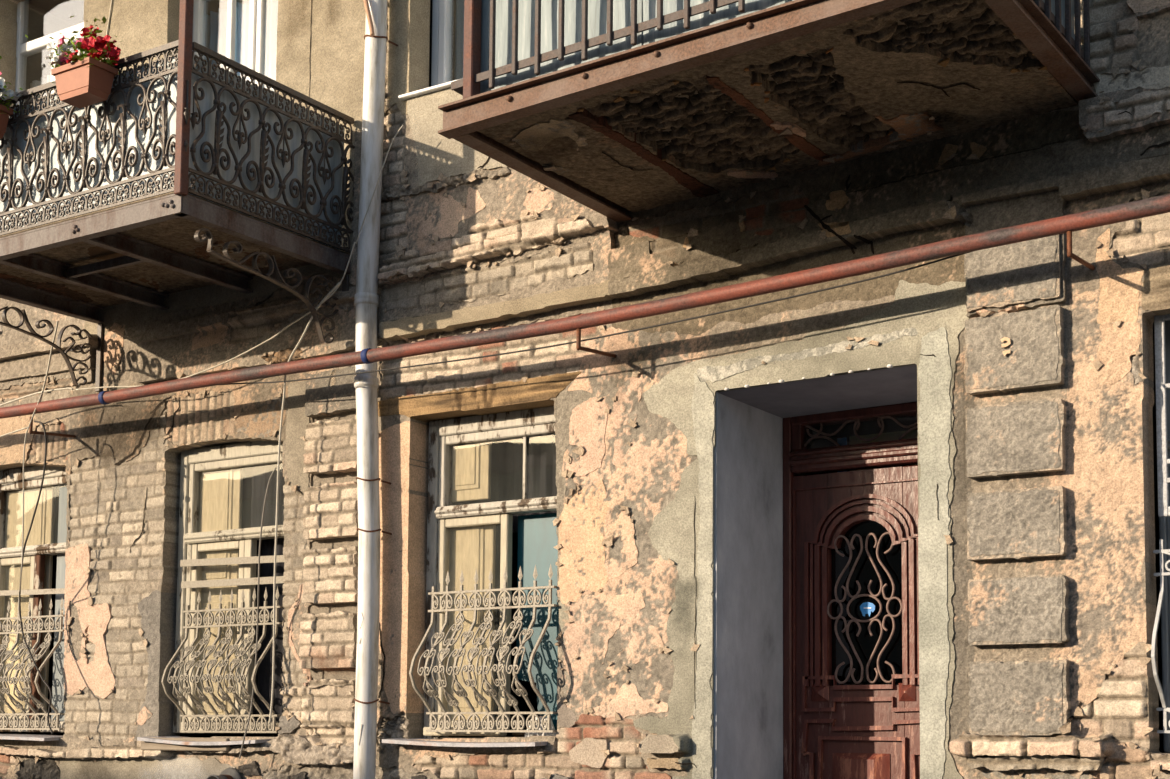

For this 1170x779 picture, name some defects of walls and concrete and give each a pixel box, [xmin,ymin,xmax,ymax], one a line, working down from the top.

flaking render [377,74,599,313]
spalling [509,48,944,267]
crack [804,205,874,254]
crack [897,82,981,97]
spalling [845,0,1047,73]
flaking render [1074,0,1170,134]
crack [1140,141,1170,156]
crack [114,396,180,465]
flaking render [26,387,289,741]
flaking render [238,478,355,779]
peeling [375,319,918,779]
flaking render [0,753,60,779]